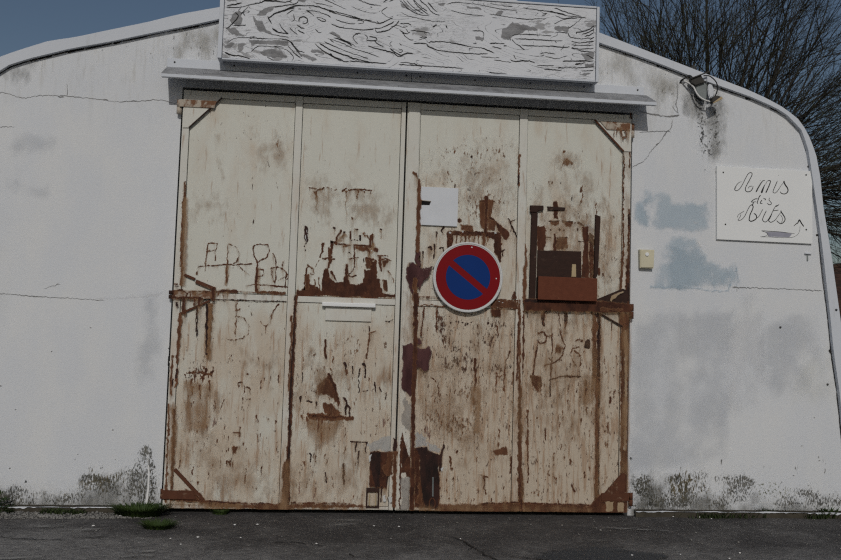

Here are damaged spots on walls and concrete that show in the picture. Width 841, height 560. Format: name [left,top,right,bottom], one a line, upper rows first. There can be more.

crack [0,21,219,104]
leakage [692,90,720,155]
crack [0,284,103,301]
rust [164,181,398,510]
leakage [0,446,158,505]
leakage [633,471,841,511]